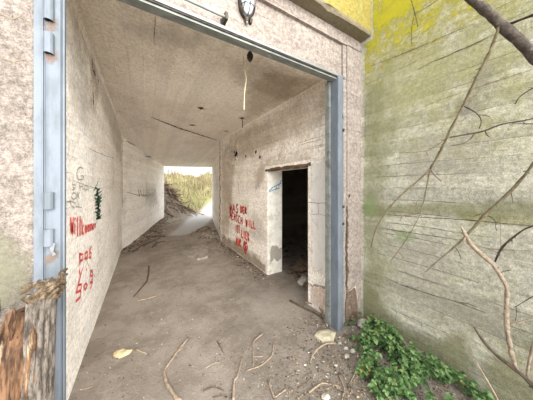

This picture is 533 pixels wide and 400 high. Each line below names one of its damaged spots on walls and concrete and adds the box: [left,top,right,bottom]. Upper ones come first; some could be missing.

spalling [270,246,282,261]
crack [343,206,351,289]
spalling [346,286,358,323]